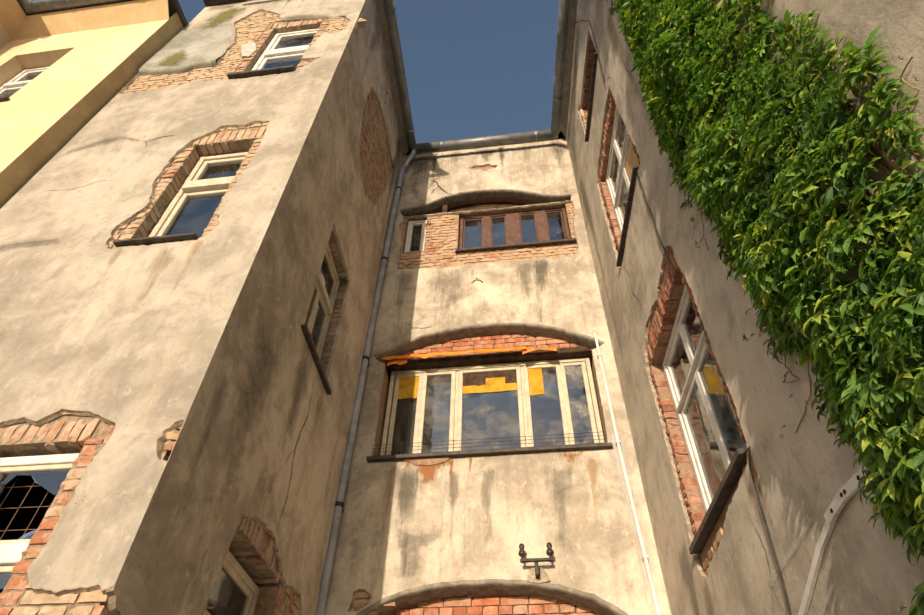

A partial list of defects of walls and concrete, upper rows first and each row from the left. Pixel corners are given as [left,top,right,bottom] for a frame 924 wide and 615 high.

damp [159,50,186,66]
damp [202,8,245,30]
flaking render [118,9,368,94]
flaking render [105,120,270,249]
flaking render [359,87,394,206]
flaking render [0,408,121,615]
flaking render [156,419,186,463]
damp [386,472,414,514]
corrosion [419,459,452,483]
flaking render [644,245,748,579]
flaking render [201,513,302,615]
flaking render [348,589,397,615]